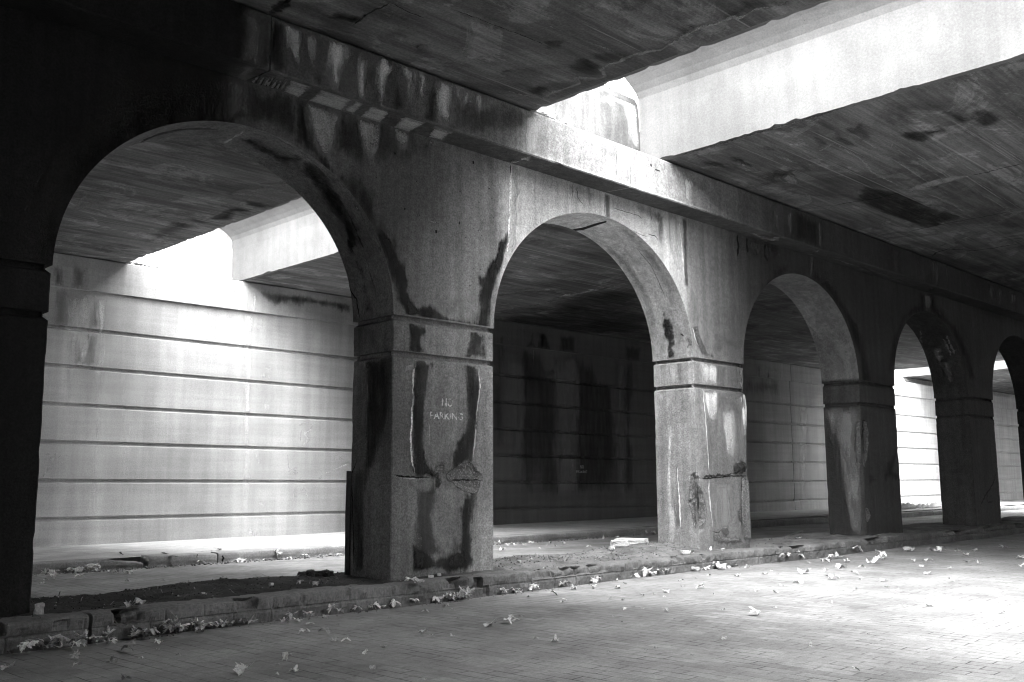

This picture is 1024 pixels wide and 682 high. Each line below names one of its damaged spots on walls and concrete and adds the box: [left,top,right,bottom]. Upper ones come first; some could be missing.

damp [266,26,299,68]
damp [328,42,348,82]
damp [377,58,391,94]
damp [903,131,939,142]
damp [861,189,958,226]
damp [663,319,674,357]
spalling [379,232,508,572]
crack [396,473,440,485]
damp [417,489,438,555]
spalling [689,473,751,544]